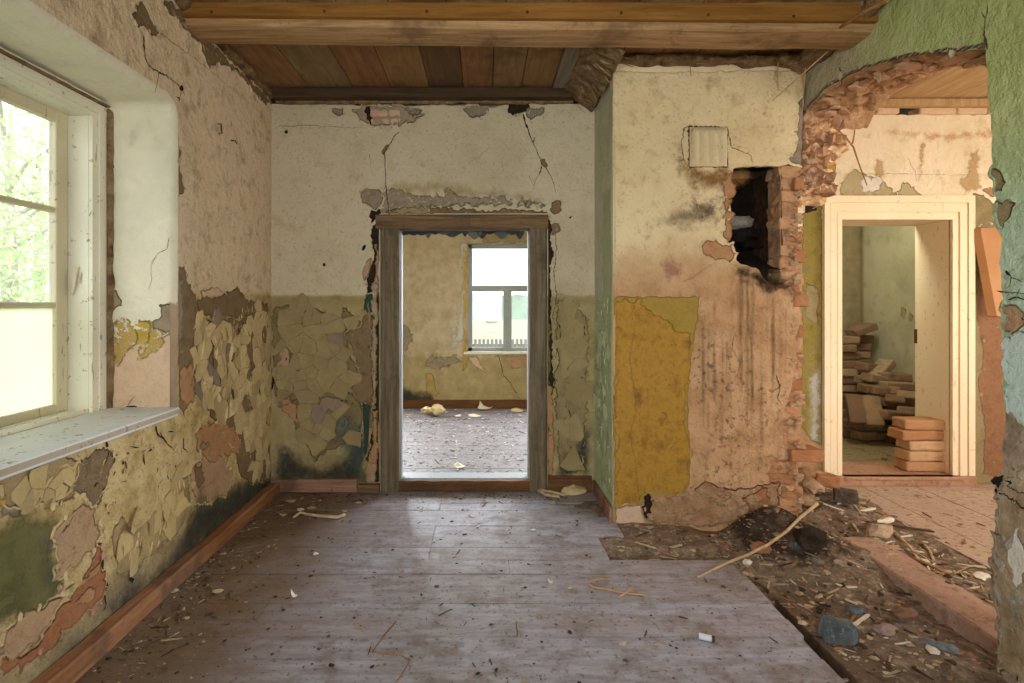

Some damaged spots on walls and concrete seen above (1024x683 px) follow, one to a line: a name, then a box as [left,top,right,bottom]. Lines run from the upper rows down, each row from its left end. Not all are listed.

spalling [129,0,272,108]
crack [143,30,361,128]
spalling [331,103,427,130]
crack [369,132,399,213]
crack [523,114,556,193]
spalling [960,153,1018,233]
peeling [548,42,987,528]
peeling [0,185,563,682]
spalling [975,250,1024,683]
leakage [0,516,60,619]
leakage [153,480,267,577]